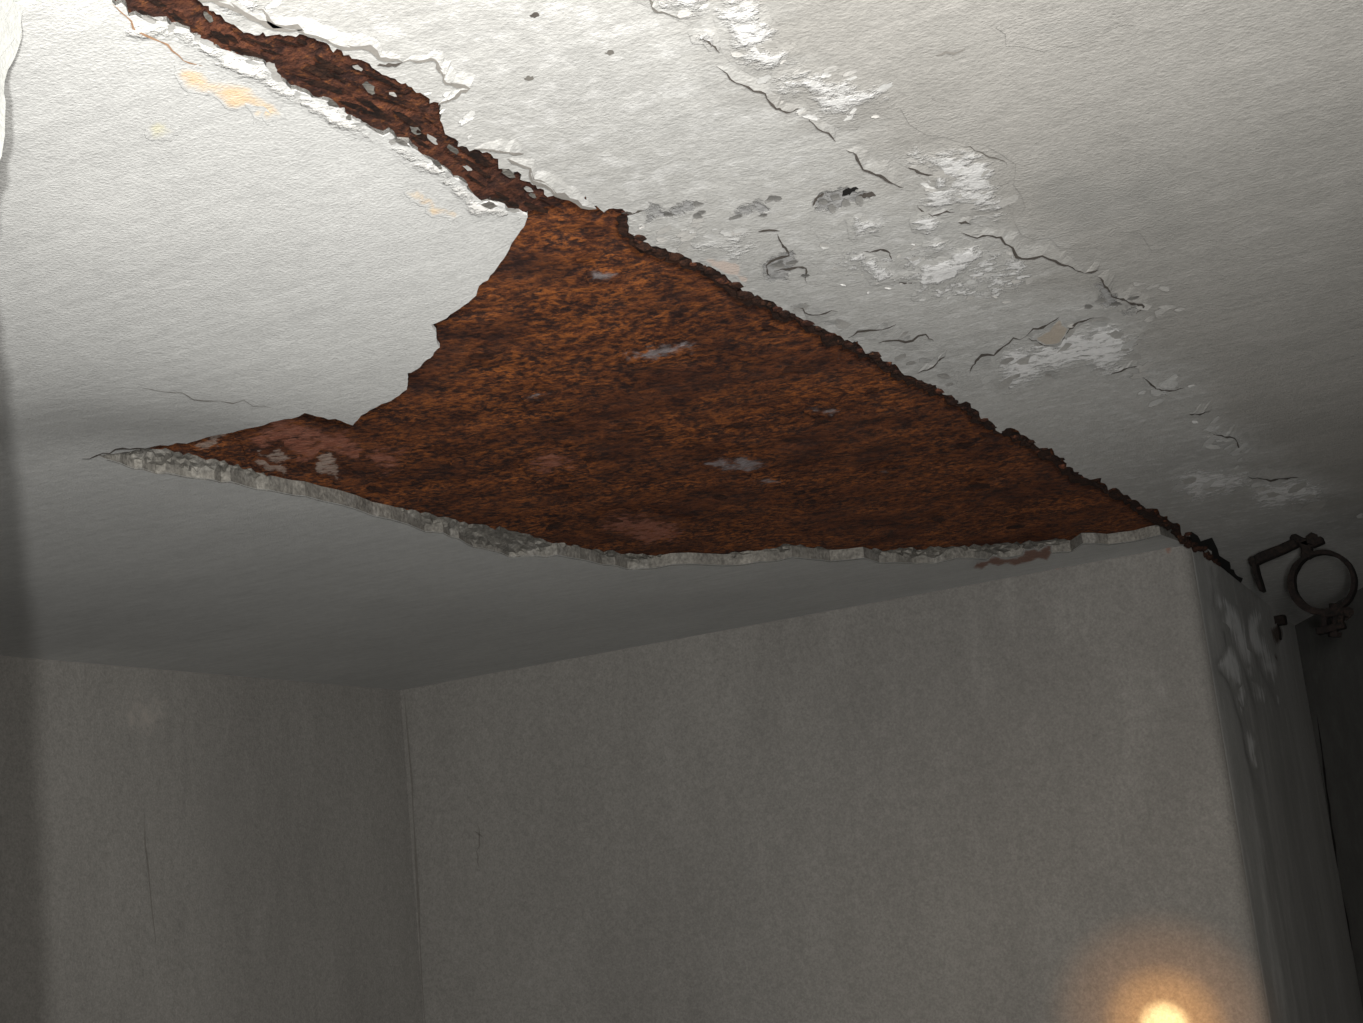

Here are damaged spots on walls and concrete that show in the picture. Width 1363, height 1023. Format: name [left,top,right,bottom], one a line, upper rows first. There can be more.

peeling [199,0,476,114]
corrosion [115,0,566,224]
peeling [634,0,905,131]
crack [650,0,1150,374]
spalling [108,110,1192,570]
corrosion [957,545,1053,570]